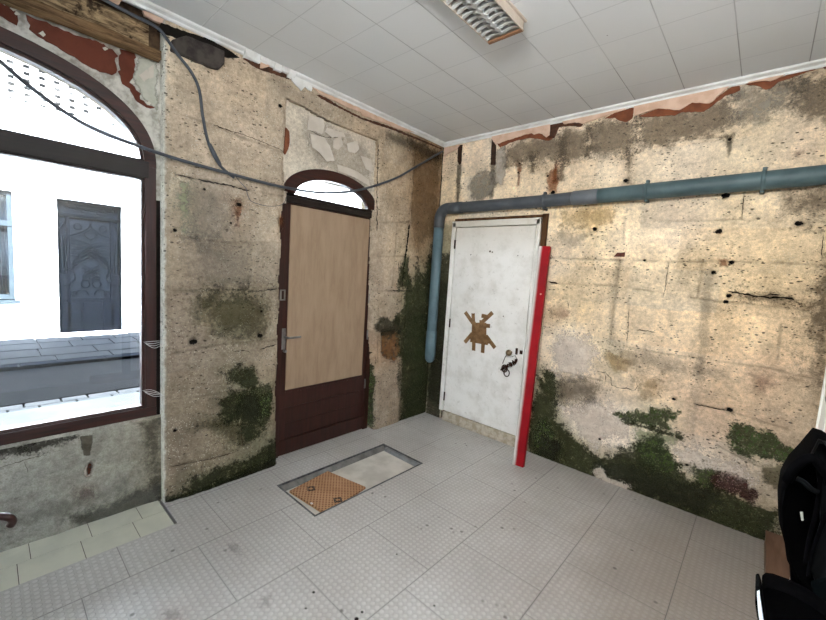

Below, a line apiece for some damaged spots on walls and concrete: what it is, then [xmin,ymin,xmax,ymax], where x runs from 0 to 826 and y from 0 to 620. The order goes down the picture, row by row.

peeling [0,3,158,110]
flaking render [142,10,460,157]
peeling [307,115,373,186]
water stain [491,76,826,186]
flaking render [492,67,826,147]
water stain [786,188,826,217]
crack [728,291,794,300]
water stain [558,398,760,506]